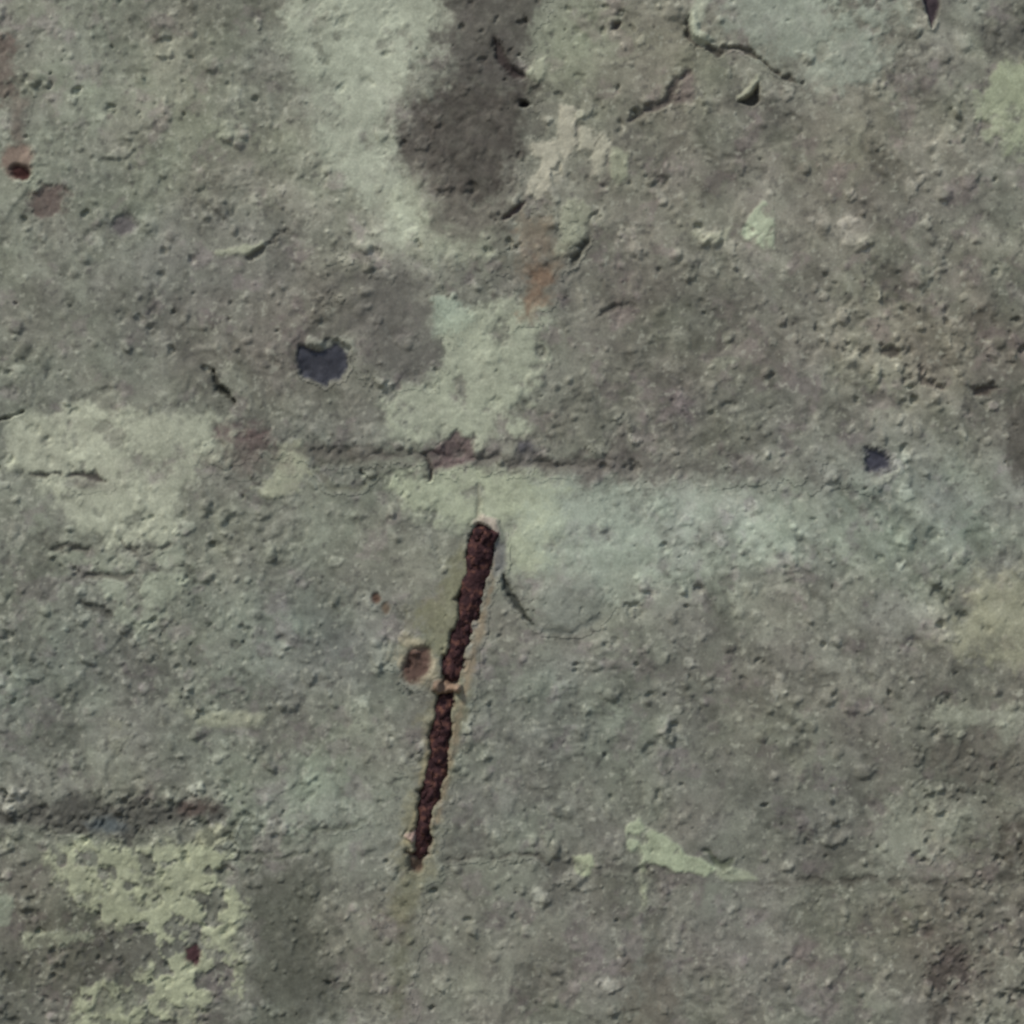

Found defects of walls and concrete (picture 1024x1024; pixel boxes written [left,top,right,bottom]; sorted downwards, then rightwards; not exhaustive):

rust [0,26,78,226]
peeling [255,0,560,452]
damp [313,0,562,402]
peeling [556,194,595,250]
peeling [529,101,631,206]
crack [624,9,807,126]
crack [208,366,238,406]
peeling [245,461,315,503]
crack [196,415,884,629]
peeling [378,462,739,879]
rust [367,520,499,1024]